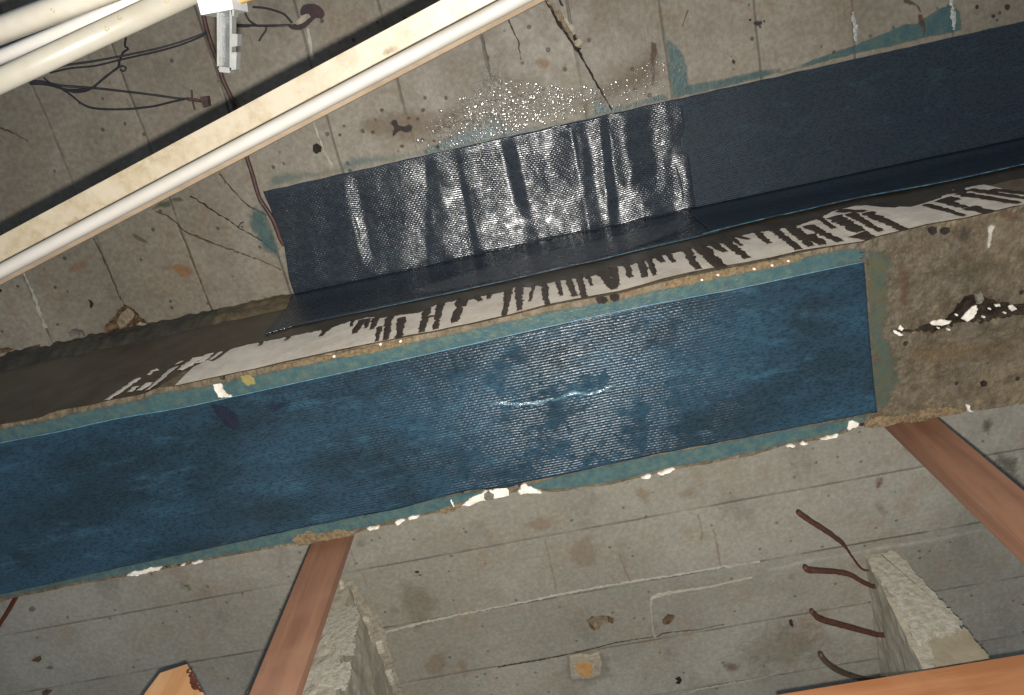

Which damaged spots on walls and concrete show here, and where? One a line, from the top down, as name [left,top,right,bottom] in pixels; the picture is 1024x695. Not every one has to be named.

spalling [104,21,1024,400]
crack [545,0,613,110]
water stain [416,42,770,154]
spalling [0,262,973,594]